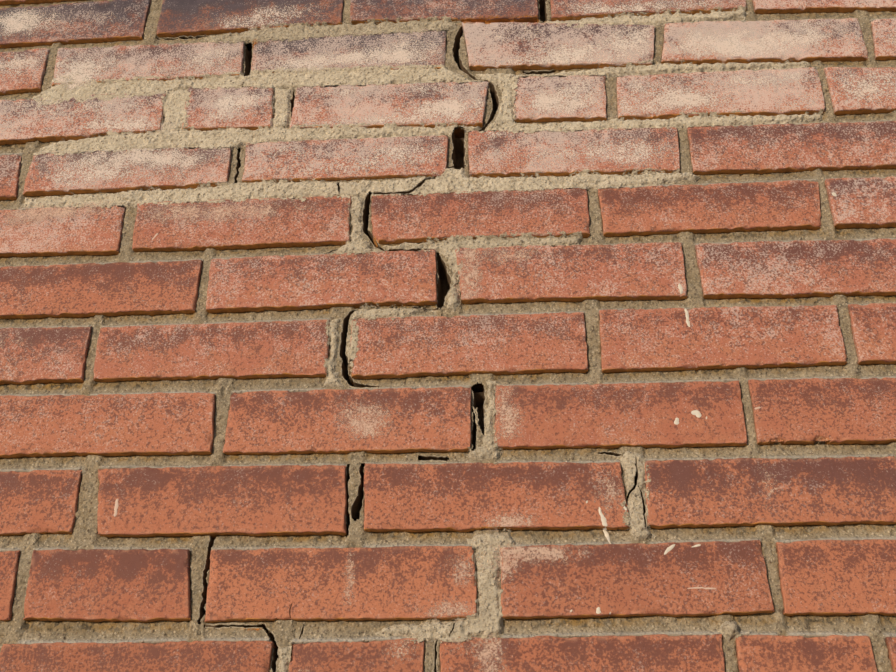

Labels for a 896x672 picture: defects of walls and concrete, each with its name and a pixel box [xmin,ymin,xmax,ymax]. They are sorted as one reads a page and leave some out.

crack [524,0,549,24]
crack [288,90,296,125]
crack [338,26,500,388]
crack [471,388,487,451]
crack [345,465,365,533]
crack [421,454,447,462]
crack [599,451,647,528]
crack [196,536,305,672]
crack [432,623,455,672]